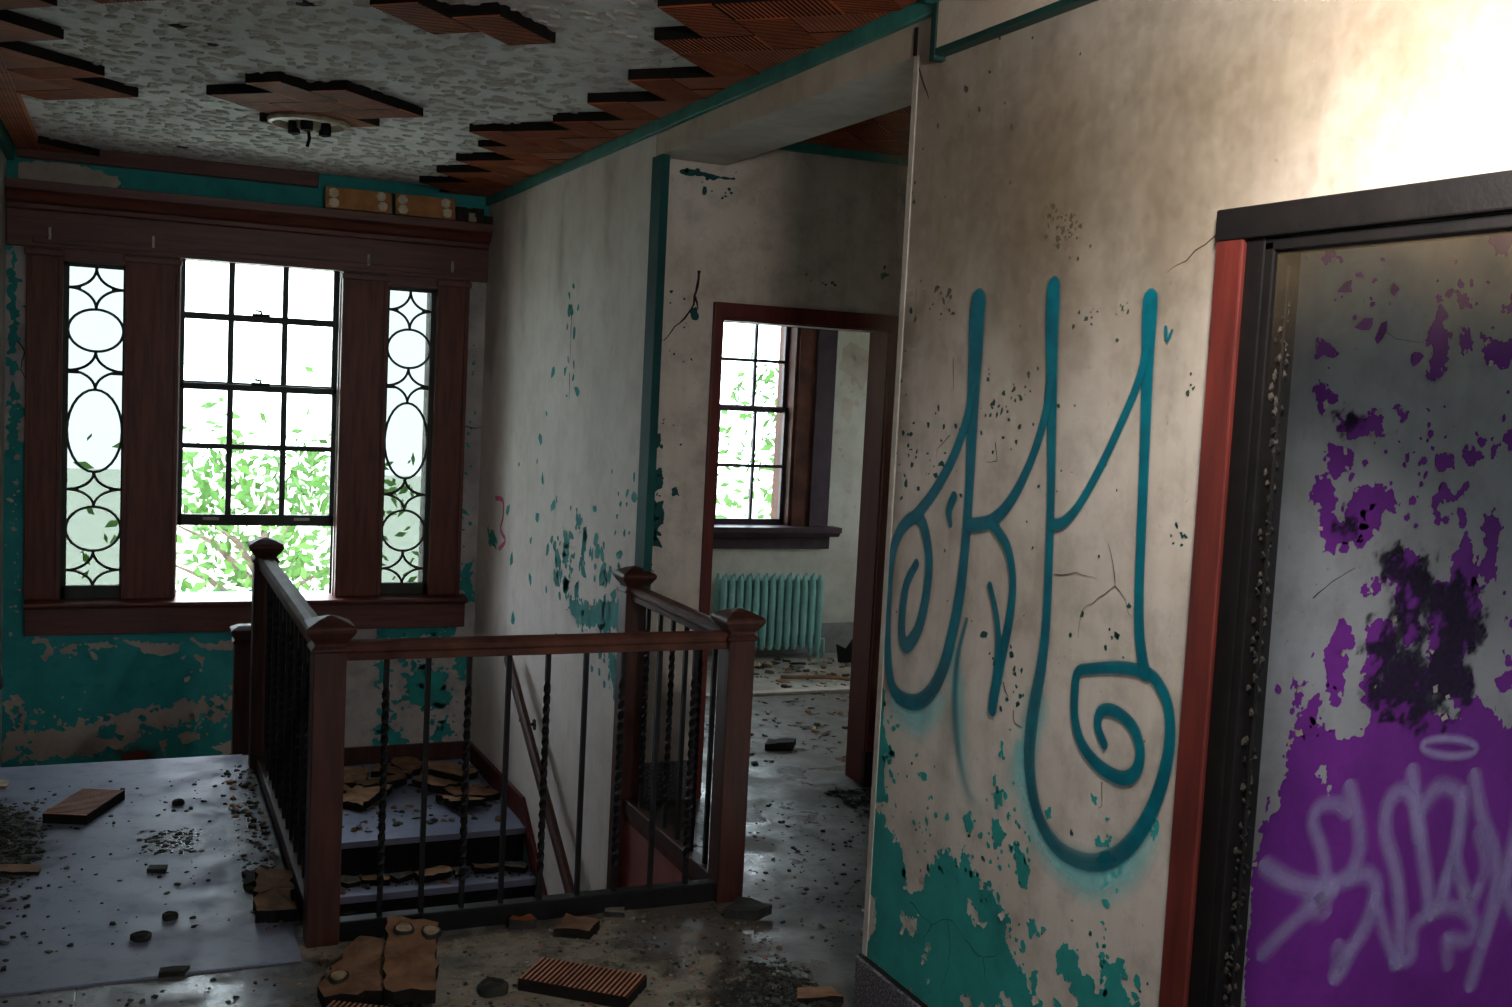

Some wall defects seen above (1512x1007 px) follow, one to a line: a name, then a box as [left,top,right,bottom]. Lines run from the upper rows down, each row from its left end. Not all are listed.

peeling [18,161,124,188]
peeling [680,168,737,199]
peeling [1411,259,1512,382]
peeling [980,367,1039,454]
peeling [518,433,637,633]
peeling [653,468,679,548]
peeling [1309,337,1512,624]
peeling [2,636,233,766]
peeling [971,620,1024,712]
leakage [1357,540,1488,735]
peeling [1244,547,1512,1007]
peeling [861,688,1149,1007]